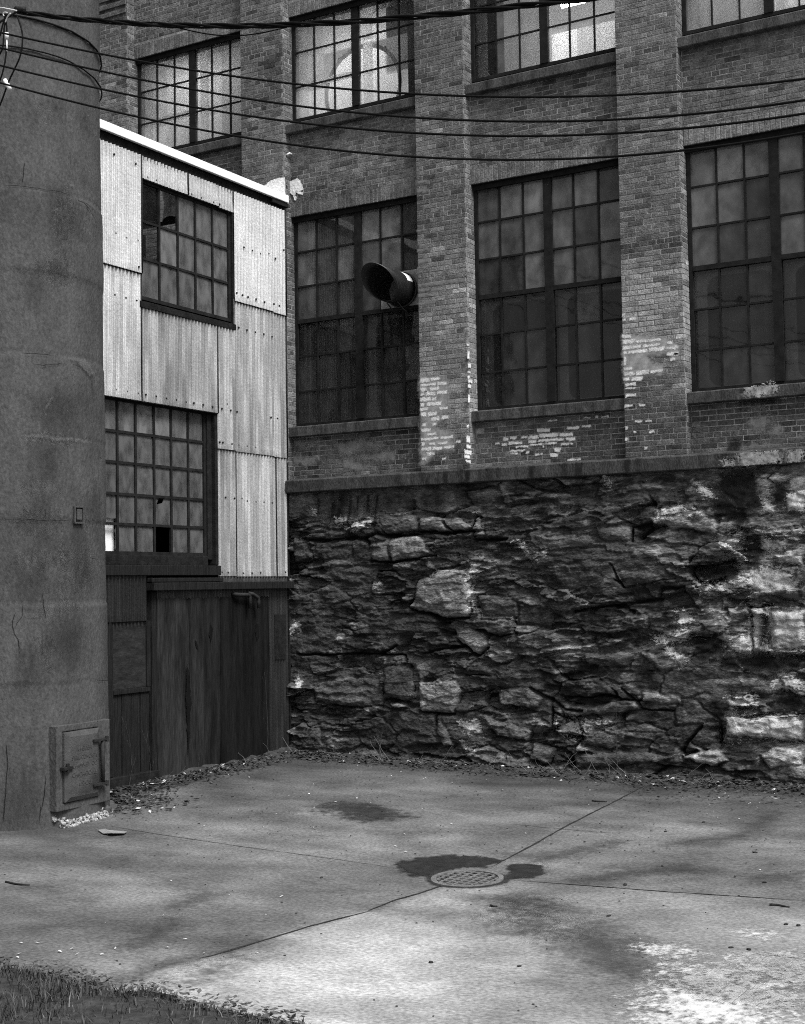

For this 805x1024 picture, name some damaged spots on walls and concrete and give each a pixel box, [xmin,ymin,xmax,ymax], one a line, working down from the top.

peeling [622,334,680,408]
peeling [419,376,472,465]
peeling [495,415,609,461]